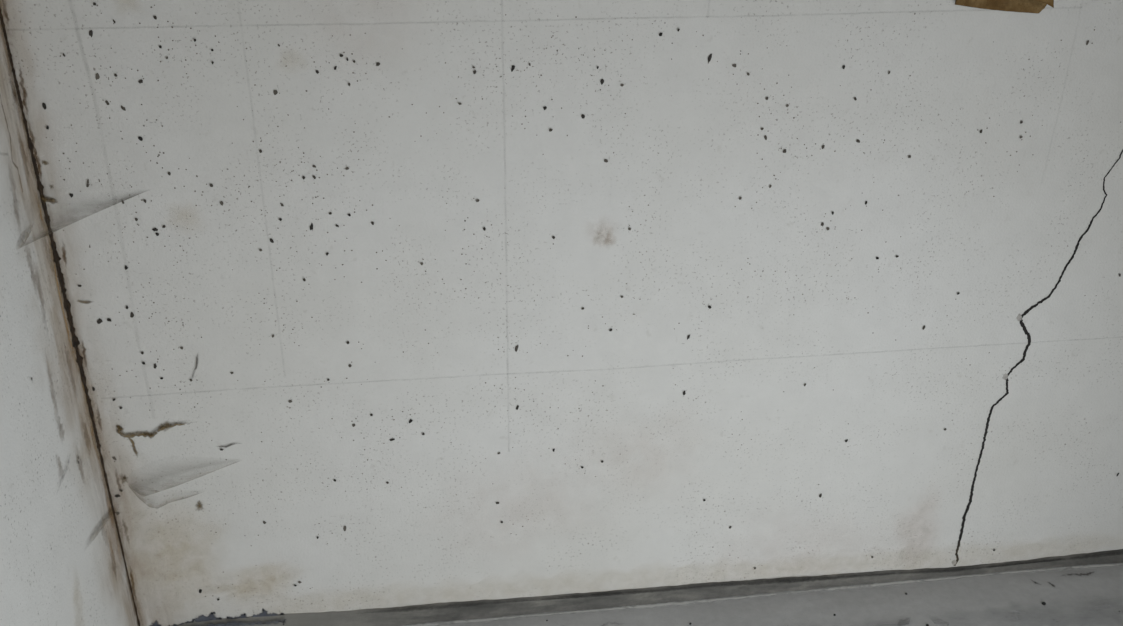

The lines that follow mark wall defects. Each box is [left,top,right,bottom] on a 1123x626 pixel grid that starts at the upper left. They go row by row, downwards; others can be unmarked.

crack [0,9,140,626]
crack [931,150,1123,572]
crack [510,574,886,602]
peeling [151,609,285,626]
crack [393,603,473,611]